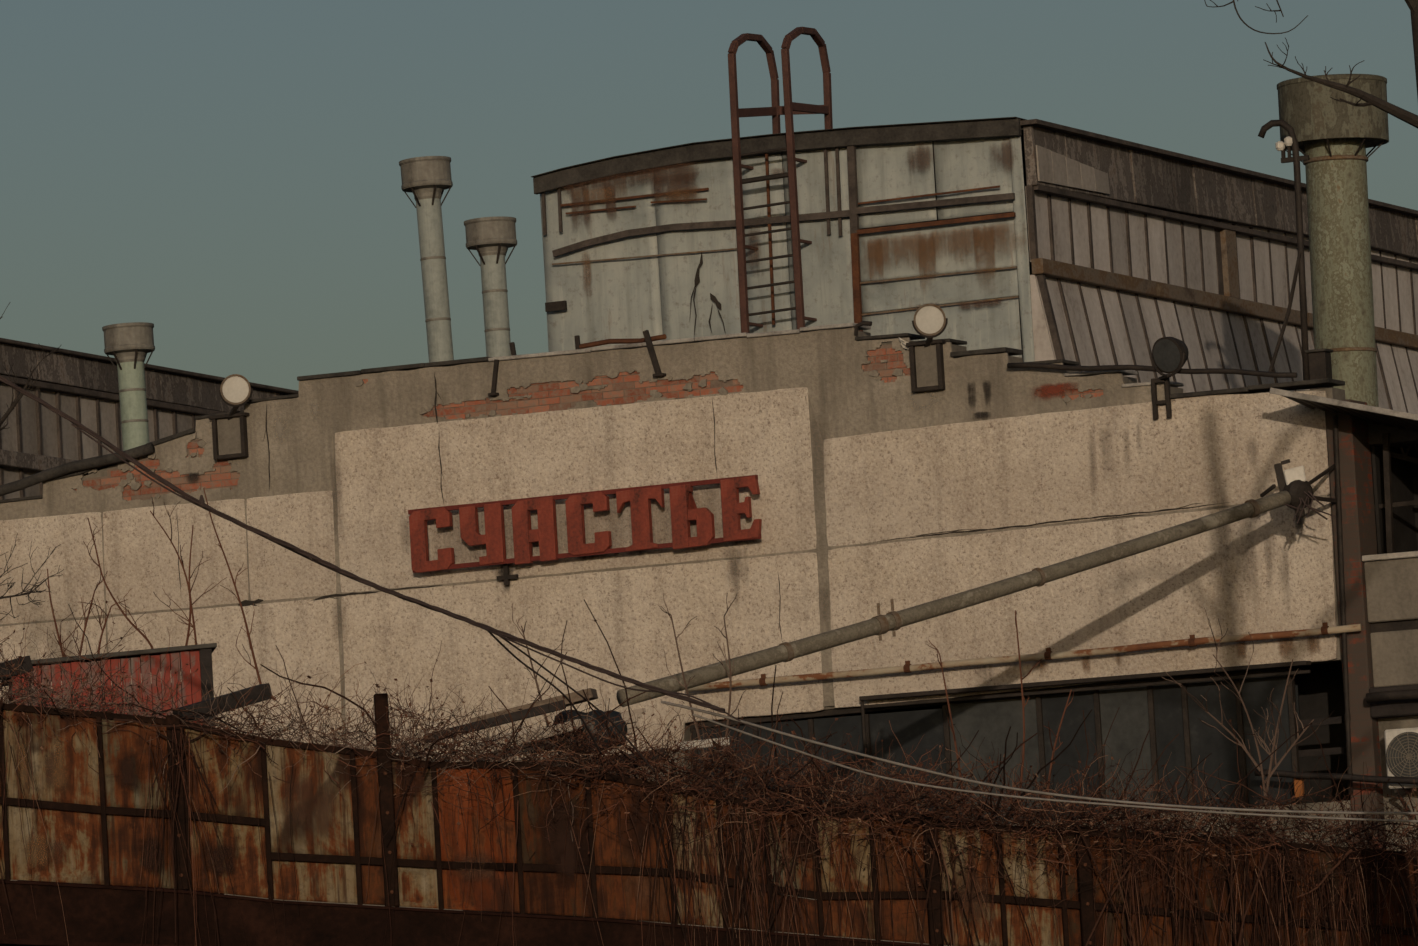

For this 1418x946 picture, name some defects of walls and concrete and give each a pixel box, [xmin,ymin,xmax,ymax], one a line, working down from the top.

rust [567,163,694,222]
rust [868,225,1008,271]
leakage [689,250,726,335]
flaking render [418,367,743,419]
flaking render [862,344,911,383]
flaking render [74,440,240,501]